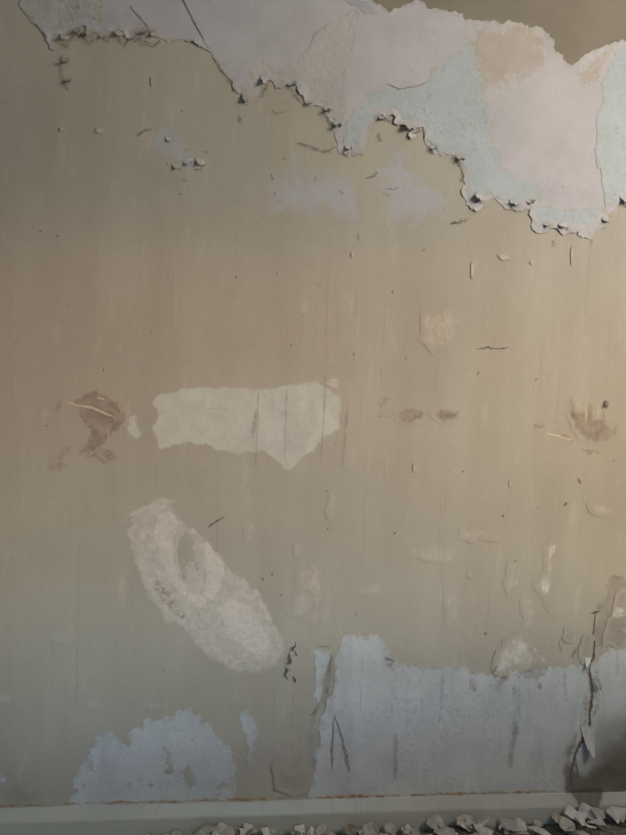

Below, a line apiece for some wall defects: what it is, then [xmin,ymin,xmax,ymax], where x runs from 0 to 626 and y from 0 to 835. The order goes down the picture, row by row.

peeling [19,0,626,239]
water stain [50,387,130,457]
peeling [69,705,237,806]
peeling [307,633,626,800]
crack [569,610,602,786]